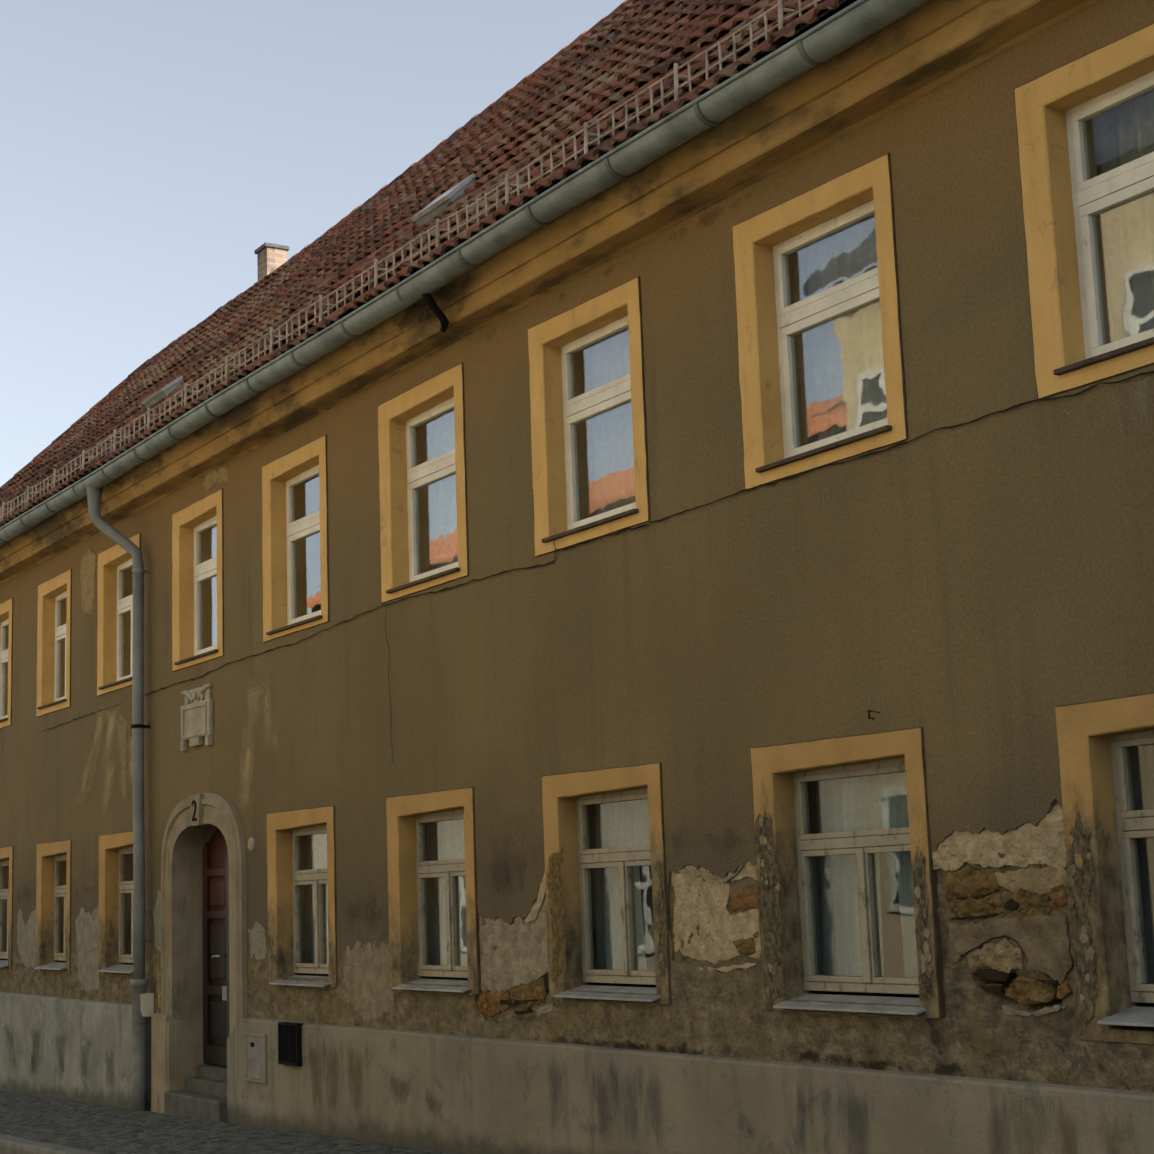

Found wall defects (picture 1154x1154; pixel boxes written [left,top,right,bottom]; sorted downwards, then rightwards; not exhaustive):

crack [43,371,1154,731]
spalling [476,846,567,1022]
spalling [669,812,785,1012]
spalling [913,801,1098,1058]
water stain [558,1037,702,1054]
water stain [799,1050,885,1070]
water stain [935,1064,960,1075]